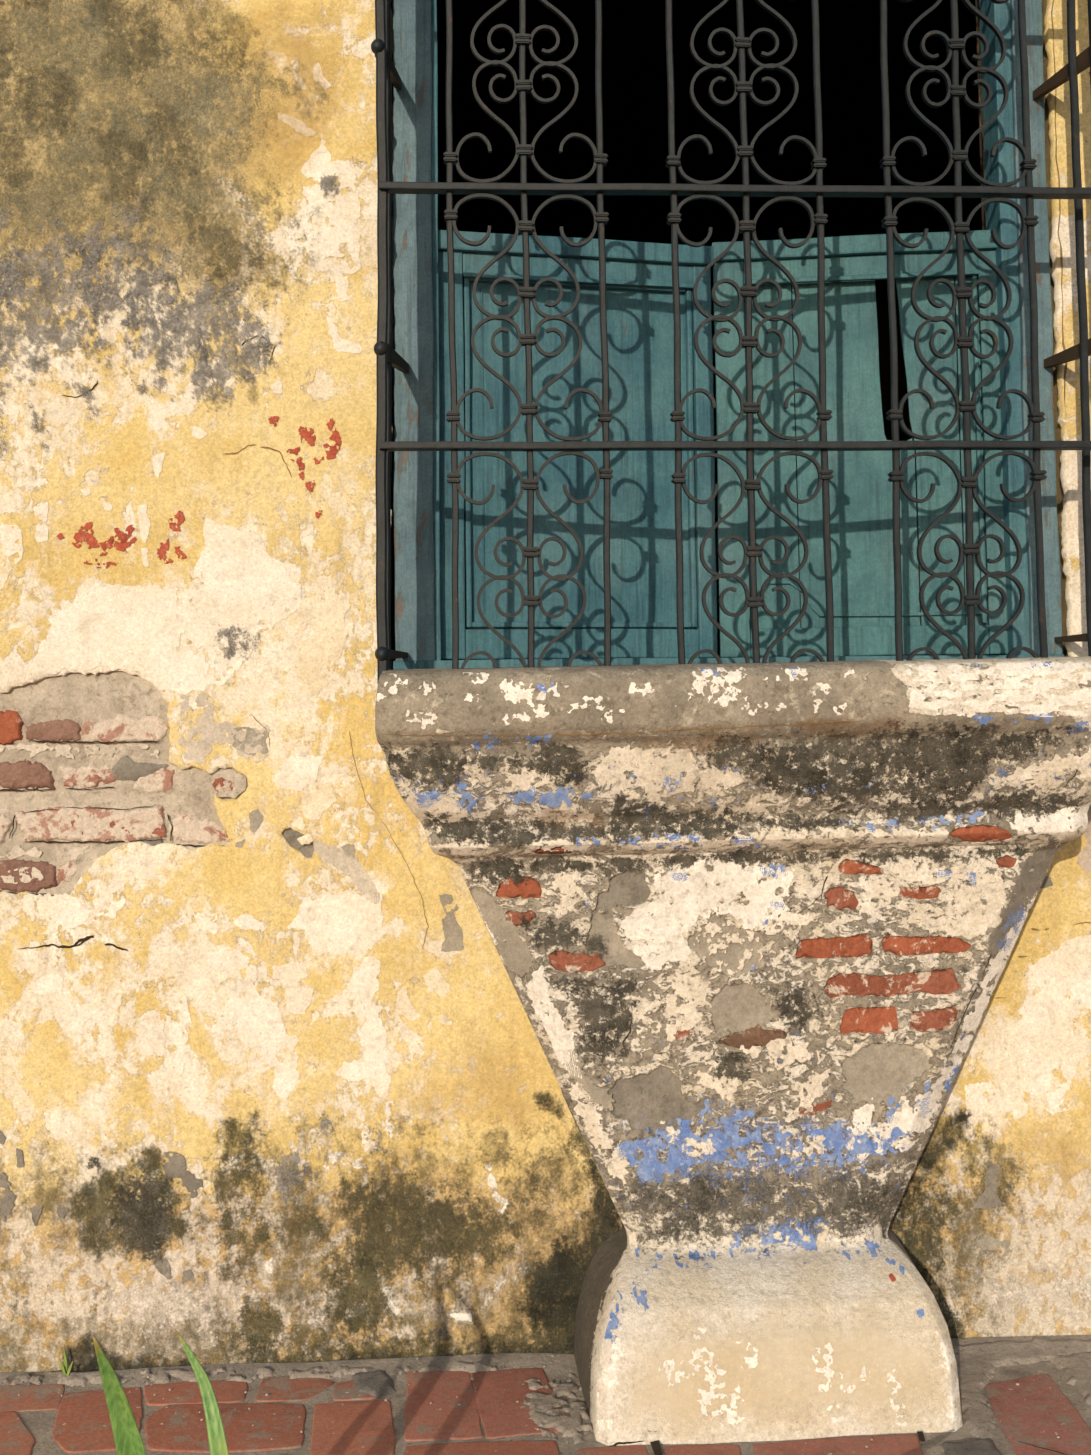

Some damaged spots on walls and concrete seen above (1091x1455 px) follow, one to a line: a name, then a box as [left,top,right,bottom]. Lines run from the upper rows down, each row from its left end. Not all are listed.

water stain [0,0,326,461]
water stain [320,175,339,196]
peeling [287,418,342,492]
water stain [382,736,592,792]
peeling [0,487,1091,1209]
water stain [424,720,1087,887]
crack [20,935,128,951]
water stain [516,914,645,1069]
flaking render [0,1131,69,1231]
peeling [485,1162,514,1226]
water stain [0,1093,1091,1373]
peeling [635,1216,905,1282]